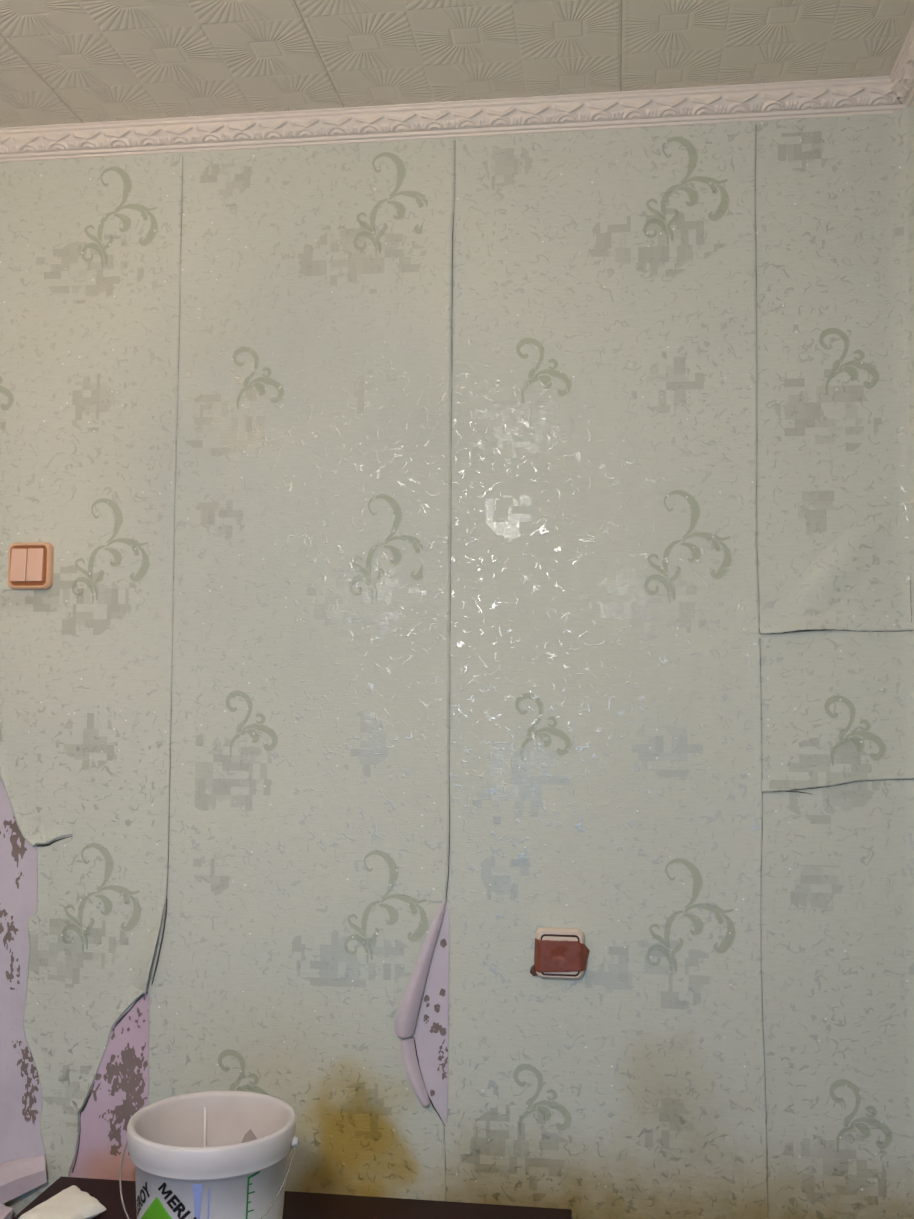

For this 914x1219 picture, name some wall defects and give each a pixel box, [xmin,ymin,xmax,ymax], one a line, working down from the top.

peeling [0,815,27,889]
peeling [0,903,20,990]
flaking render [414,905,449,1125]
peeling [12,1041,39,1124]
flaking render [70,991,149,1181]